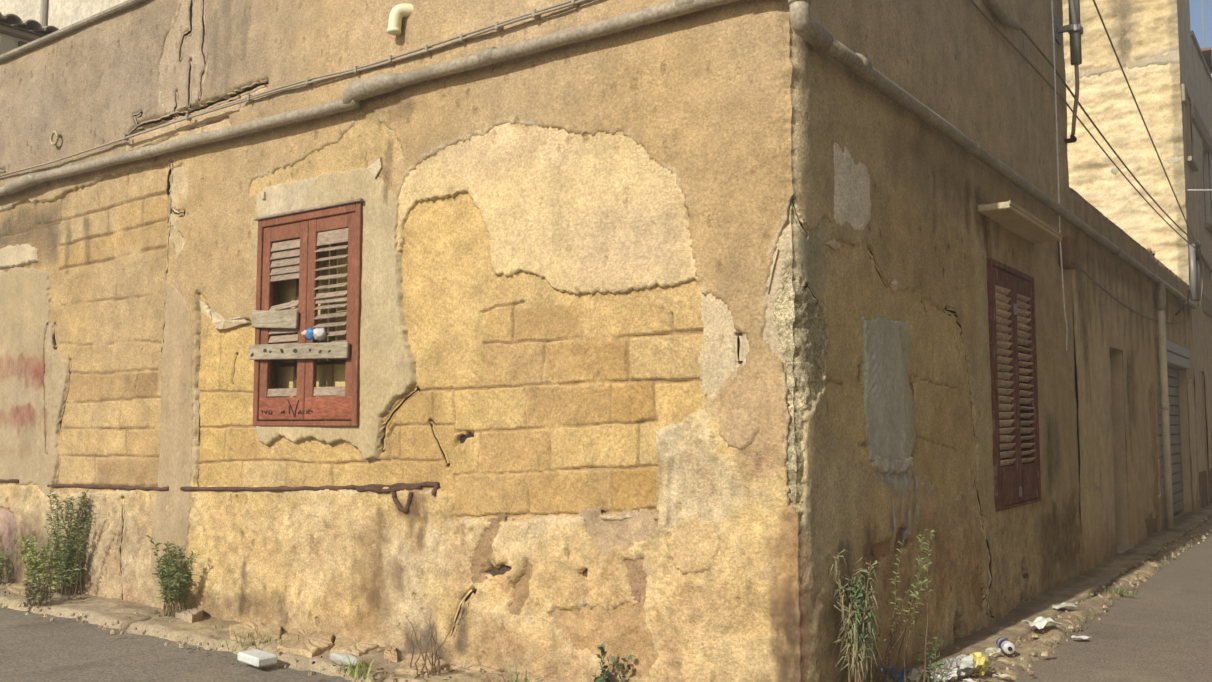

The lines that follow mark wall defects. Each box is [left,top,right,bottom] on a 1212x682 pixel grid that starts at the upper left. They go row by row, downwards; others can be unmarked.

flaking render [0,164,188,494]
crack [161,163,184,361]
crack [129,0,269,149]
flaking render [198,111,834,679]
crack [791,200,809,235]
crack [921,301,995,620]